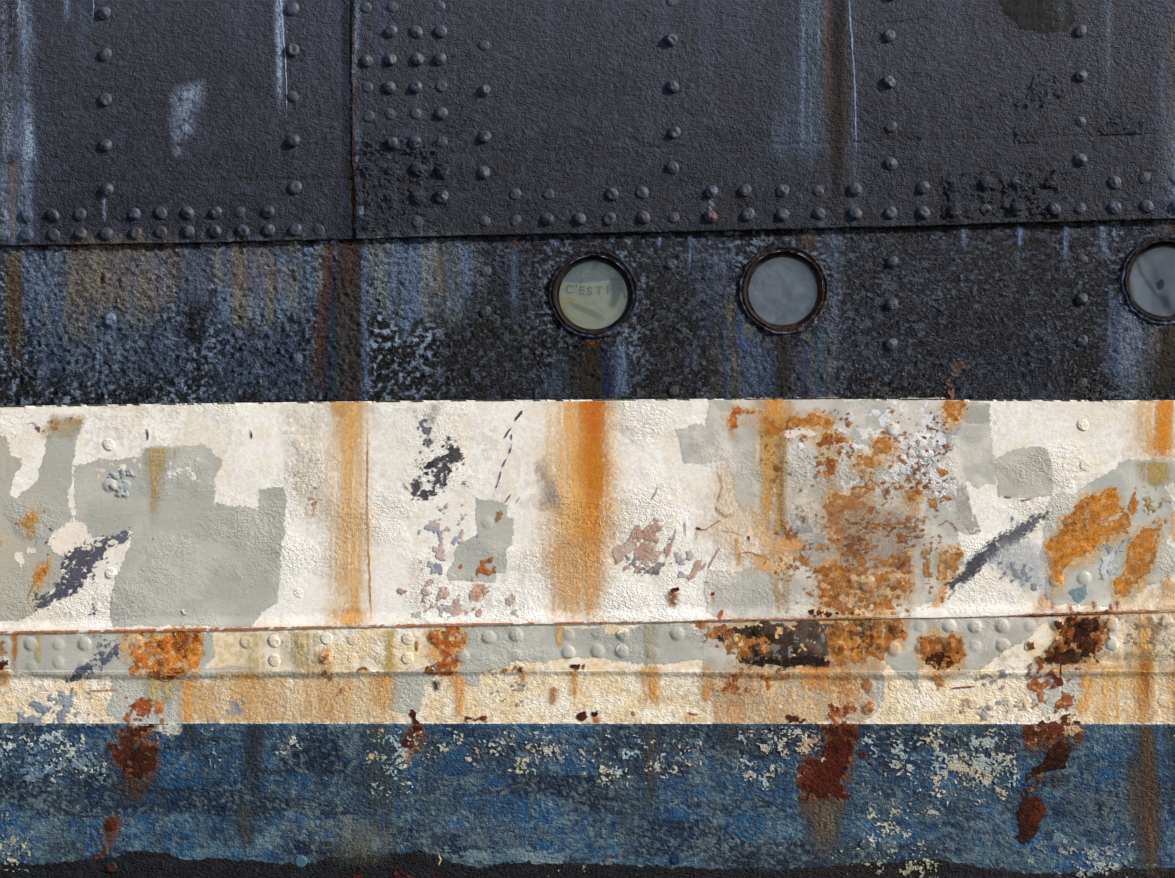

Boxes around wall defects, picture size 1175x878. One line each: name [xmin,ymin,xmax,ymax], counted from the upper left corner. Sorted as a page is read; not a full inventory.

leakage [0,0,324,397]
leakage [776,0,859,212]
peeling [167,458,200,483]
corrosion [0,0,534,857]
corrosion [549,664,585,704]
corrosion [546,340,628,646]
corrosion [576,711,600,723]
leakage [688,236,776,397]
corrosion [622,336,968,850]
leakage [790,221,841,398]
corrosion [1012,327,1175,874]
leakage [1106,292,1175,398]